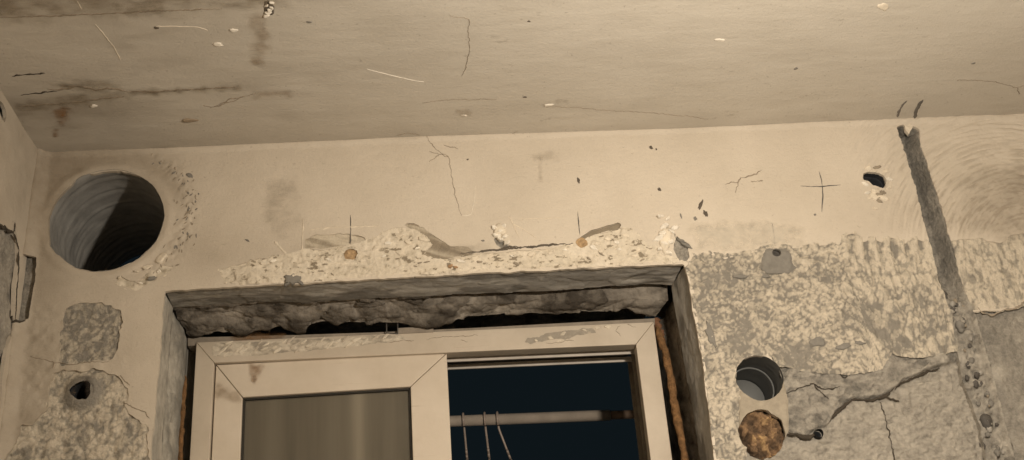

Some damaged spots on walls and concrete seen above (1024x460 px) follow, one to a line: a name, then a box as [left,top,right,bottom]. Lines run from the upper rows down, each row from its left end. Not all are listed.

crack [425,16,497,103]
crack [399,133,462,215]
crack [725,171,763,193]
spalling [6,284,701,460]
spalling [218,200,983,460]
crack [787,368,940,460]
spalling [951,234,1024,460]